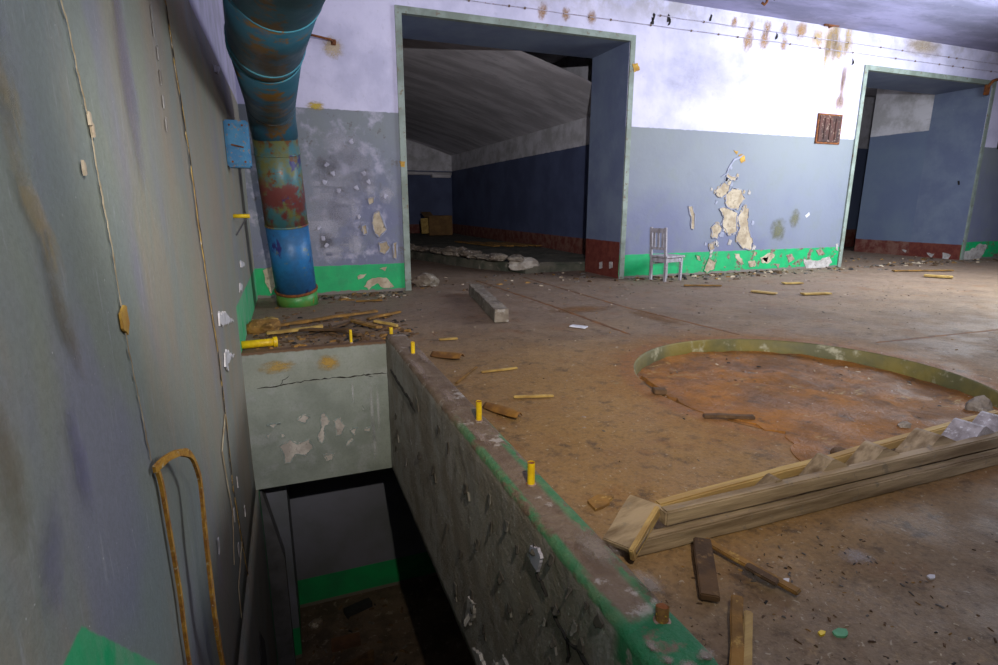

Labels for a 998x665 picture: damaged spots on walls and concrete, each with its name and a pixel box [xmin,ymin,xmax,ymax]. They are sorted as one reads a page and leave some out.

rust [744,25,770,48]
rust [782,24,851,66]
peeling [312,139,398,290]
peeling [696,150,838,274]
crack [257,369,415,412]
peeling [266,413,371,464]
peeling [529,545,543,572]
spalling [464,596,476,627]
spalling [471,647,509,665]